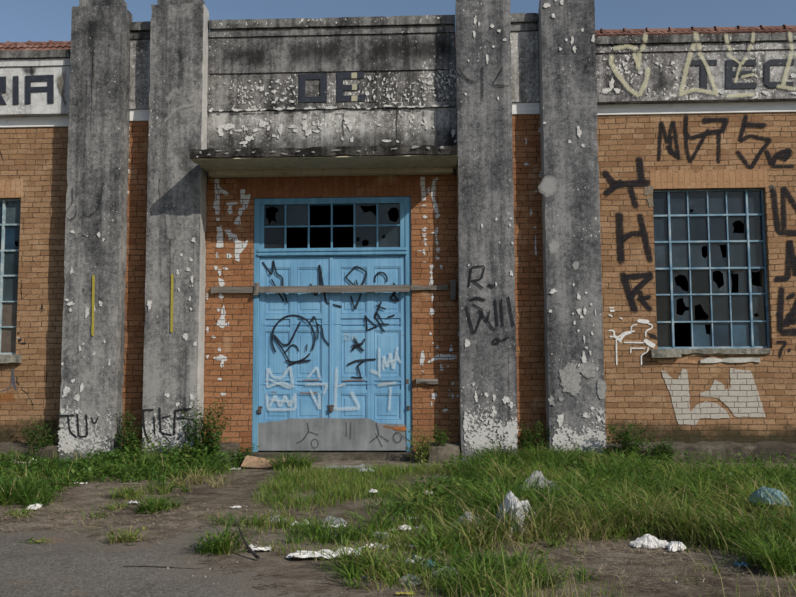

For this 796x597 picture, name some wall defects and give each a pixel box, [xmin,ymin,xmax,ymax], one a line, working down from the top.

water stain [375,42,446,56]
peeling [199,79,322,155]
peeling [365,73,449,130]
peeling [206,179,250,338]
peeling [419,177,443,315]
peeling [420,332,457,372]
spalling [548,283,607,457]
peeling [57,379,112,456]
peeling [142,393,195,453]
peeling [463,382,519,453]